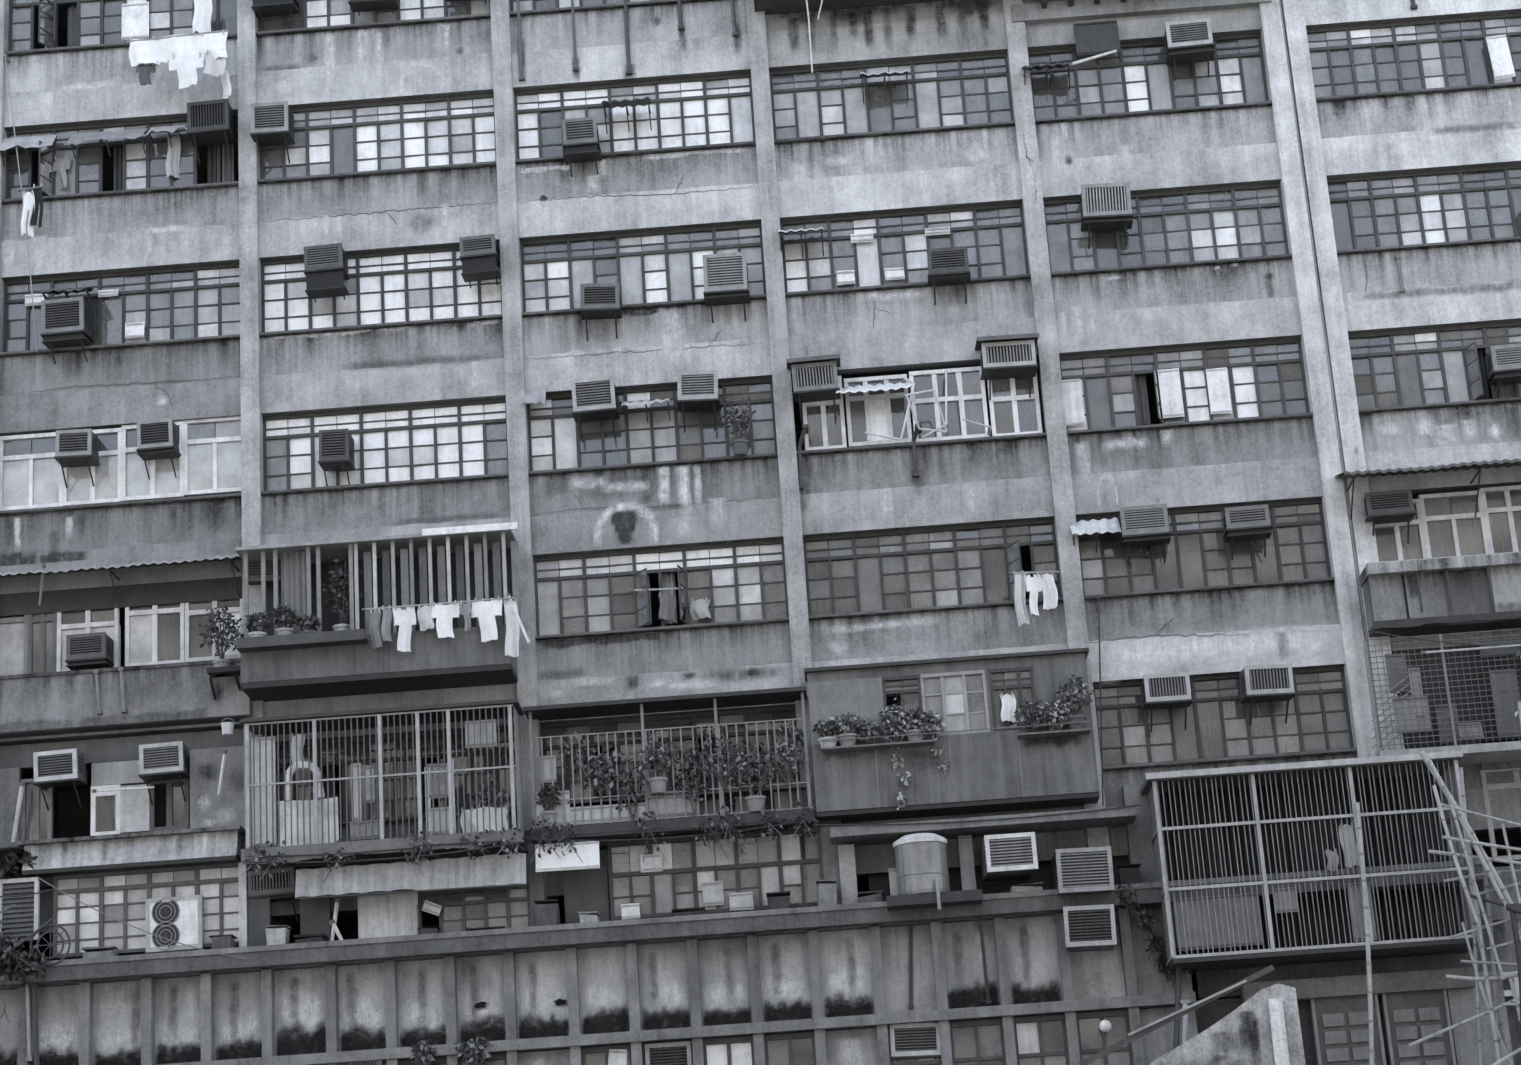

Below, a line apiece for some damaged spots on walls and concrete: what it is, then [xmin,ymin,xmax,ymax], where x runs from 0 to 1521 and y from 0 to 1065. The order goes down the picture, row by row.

crack [262,174,749,225]
damp [950,958,1060,1009]
damp [39,965,873,1065]
damp [0,1052,17,1065]